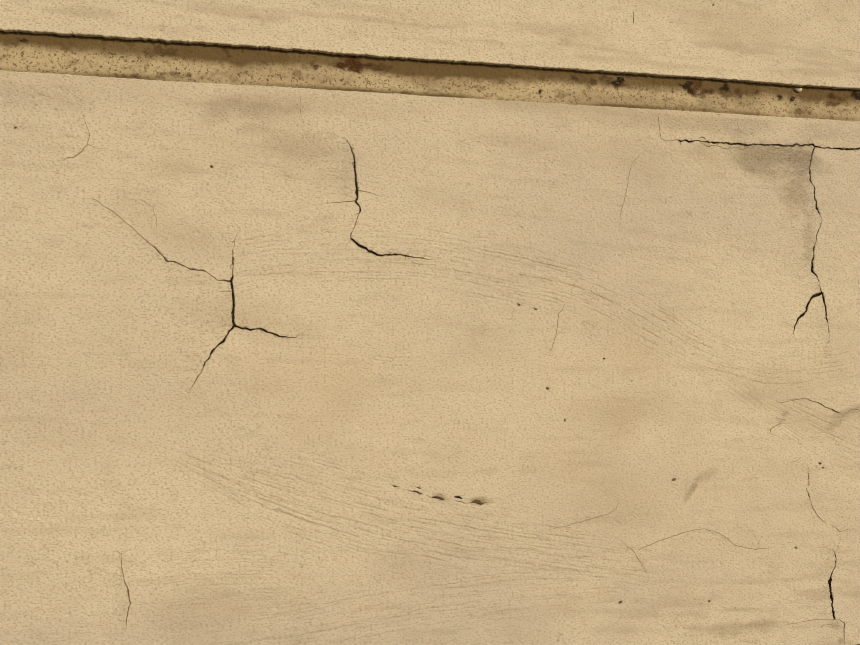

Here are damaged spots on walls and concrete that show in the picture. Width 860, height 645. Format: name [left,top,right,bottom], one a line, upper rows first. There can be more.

crack [88,198,299,393]
crack [331,138,429,260]
crack [658,117,860,343]
crack [788,458,848,643]